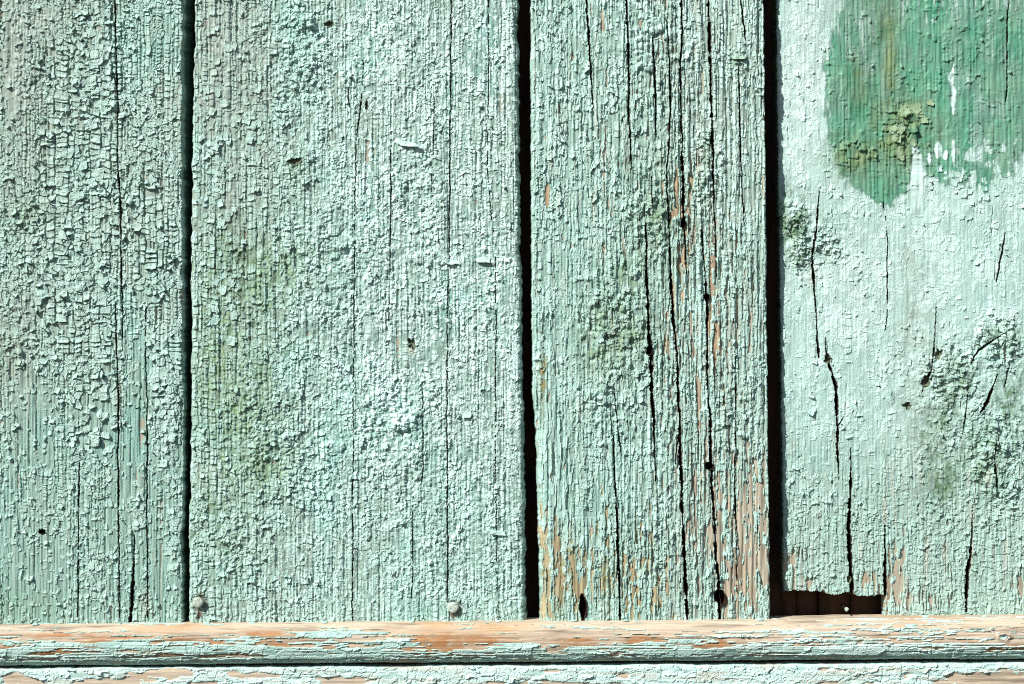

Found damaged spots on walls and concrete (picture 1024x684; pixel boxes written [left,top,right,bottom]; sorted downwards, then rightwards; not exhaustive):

crack [114,0,148,623]
peeling [545,182,553,210]
peeling [582,130,696,419]
crack [626,0,738,619]
peeling [698,235,721,376]
crack [811,191,854,594]
water stain [823,0,1024,207]
crack [962,364,1010,434]
peeling [537,397,669,621]
crack [613,406,621,620]
peeling [707,439,770,619]
crack [964,510,973,612]